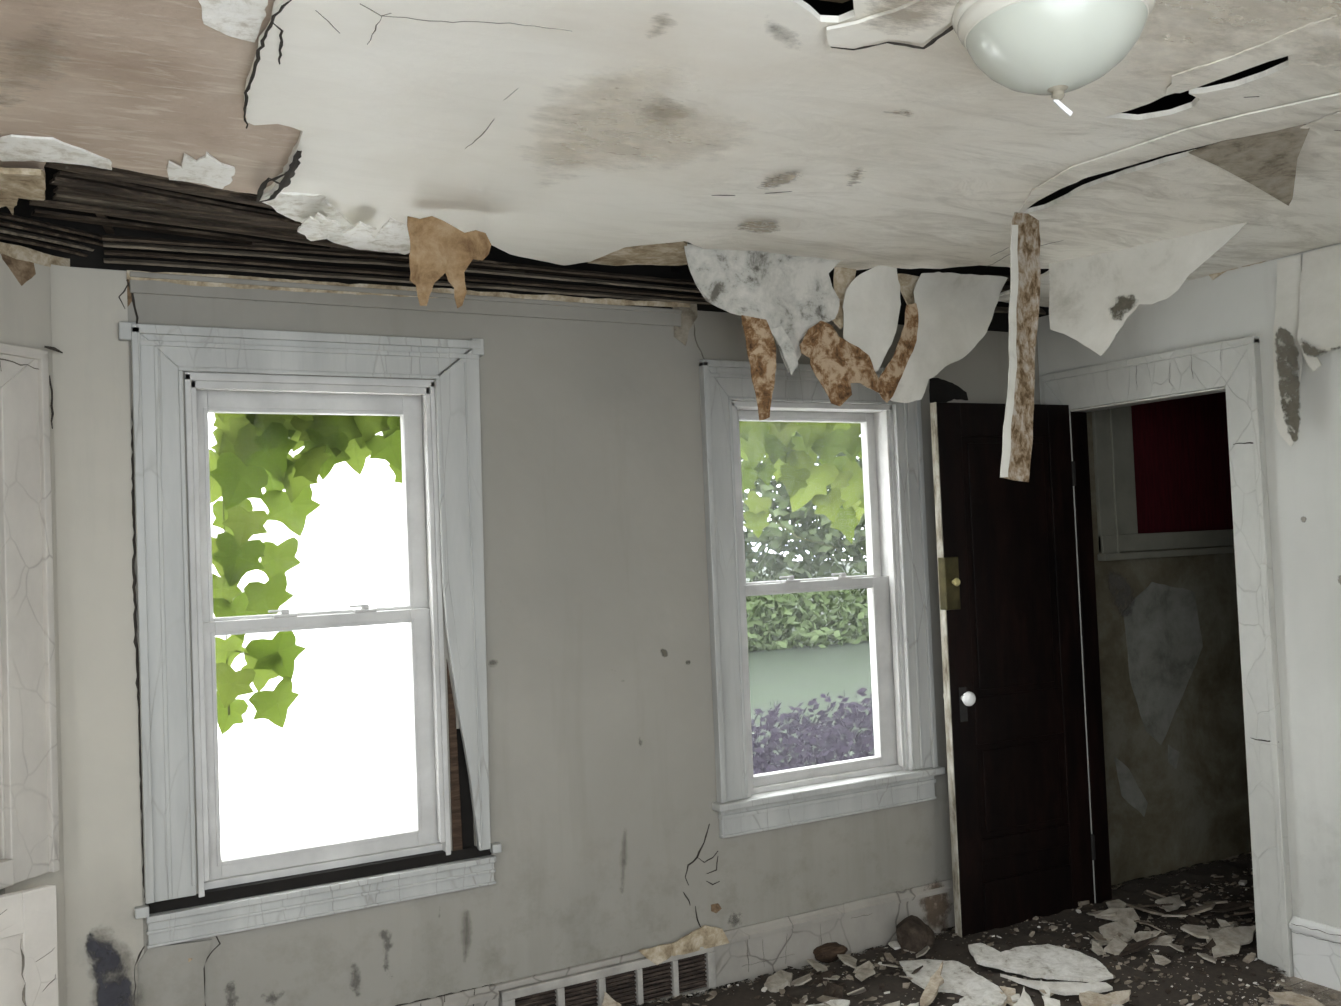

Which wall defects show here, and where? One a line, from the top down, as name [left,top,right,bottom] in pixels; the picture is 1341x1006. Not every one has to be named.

flaking render [827,0,960,48]
crack [243,0,572,129]
flaking render [0,0,410,255]
flaking render [0,242,70,286]
flaking render [588,241,688,266]
spalling [929,378,968,403]
crack [683,824,720,927]
crack [1291,923,1341,944]
crack [20,944,56,1006]
crack [133,946,145,1004]
crack [203,936,221,1006]
crack [396,982,502,1006]